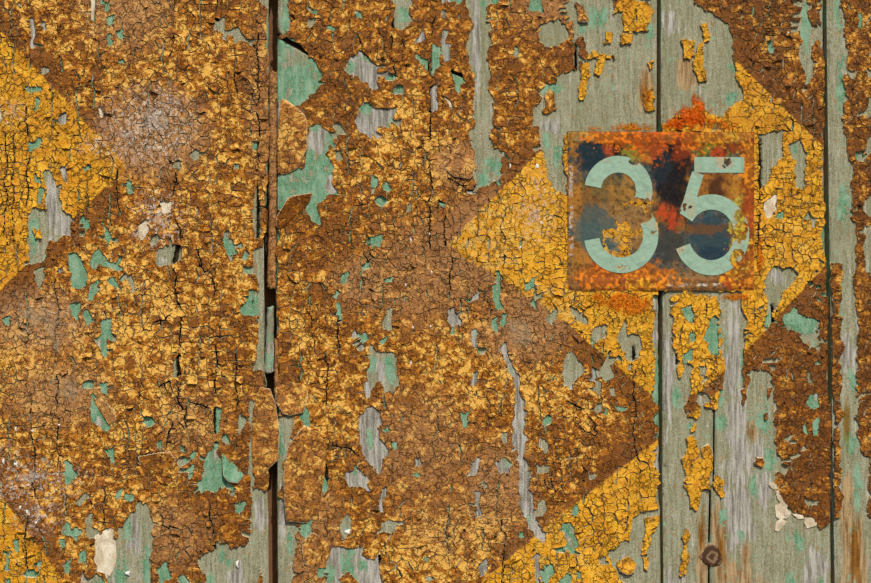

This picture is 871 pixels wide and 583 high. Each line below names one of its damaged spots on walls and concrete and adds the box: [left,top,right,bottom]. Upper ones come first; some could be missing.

crack [3,115,30,250]
peeling [260,0,338,231]
peeling [440,0,504,192]
peeling [531,0,743,195]
corrosion [667,97,726,129]
crack [30,279,68,492]
crack [137,173,239,463]
peeling [59,381,384,583]
crack [324,318,340,404]
peeling [345,307,399,534]
crack [632,349,643,462]
peeling [598,0,871,583]